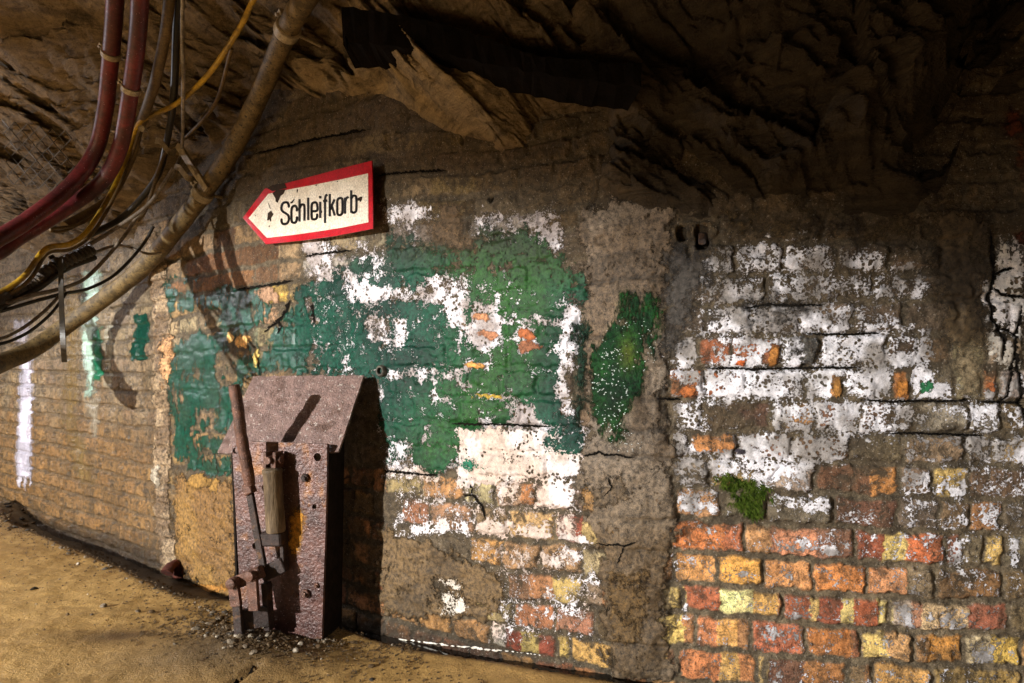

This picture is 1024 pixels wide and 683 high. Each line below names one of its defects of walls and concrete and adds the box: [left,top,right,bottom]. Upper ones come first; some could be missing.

crack [863,230,1024,418]
peeling [129,197,602,648]
crack [462,484,486,520]
crack [583,451,632,496]
peeling [662,227,1024,683]